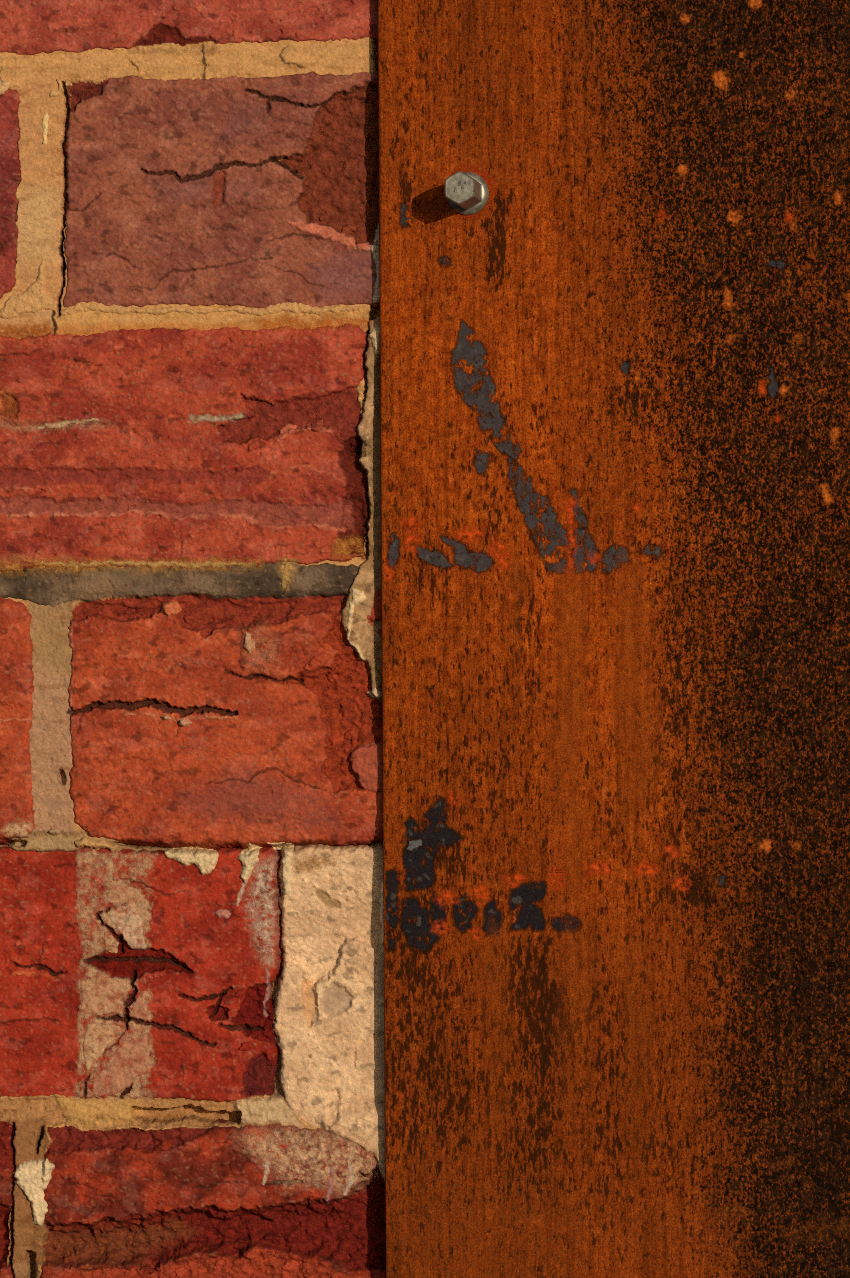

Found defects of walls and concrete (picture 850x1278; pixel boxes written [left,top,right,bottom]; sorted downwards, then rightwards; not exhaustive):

rust [713,71,728,89]
crack [141,156,304,183]
peeling [451,322,630,574]
rust [563,499,575,576]
peeling [643,544,661,557]
crack [231,672,304,685]
crack [67,699,238,716]
peeling [386,797,581,952]
crack [14,908,264,1046]
crack [120,1084,132,1099]